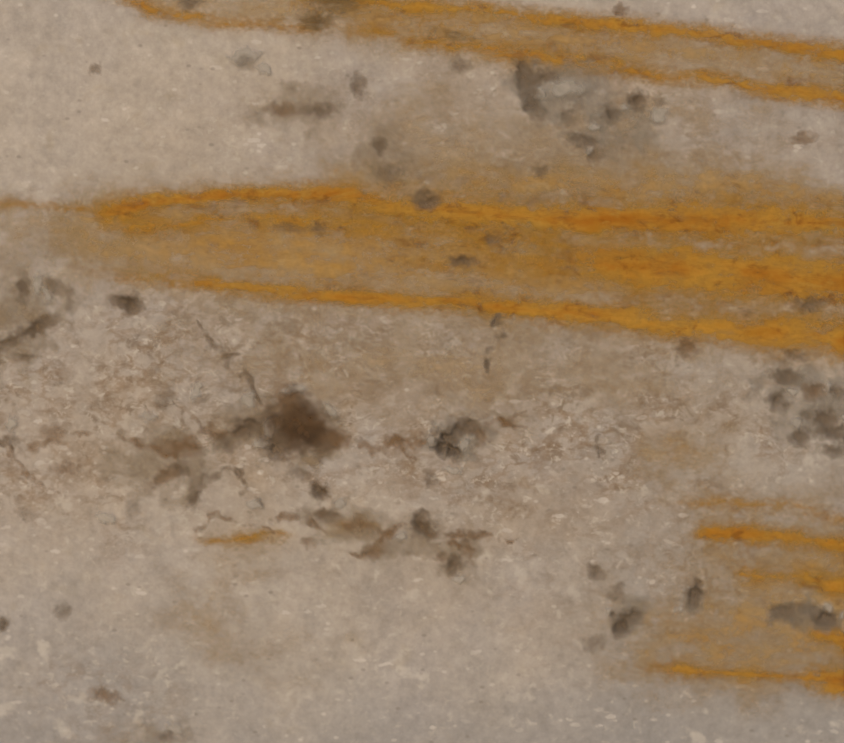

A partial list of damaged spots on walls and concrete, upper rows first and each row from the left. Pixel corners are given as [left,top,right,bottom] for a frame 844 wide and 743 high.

rust [125,0,844,108]
spalling [516,63,587,110]
rust [71,163,844,358]
spalling [0,277,51,356]
spalling [226,385,336,466]
spalling [427,420,480,459]
spalling [773,370,844,454]
spalling [313,485,326,498]
spalling [414,511,429,536]
rust [640,525,844,696]